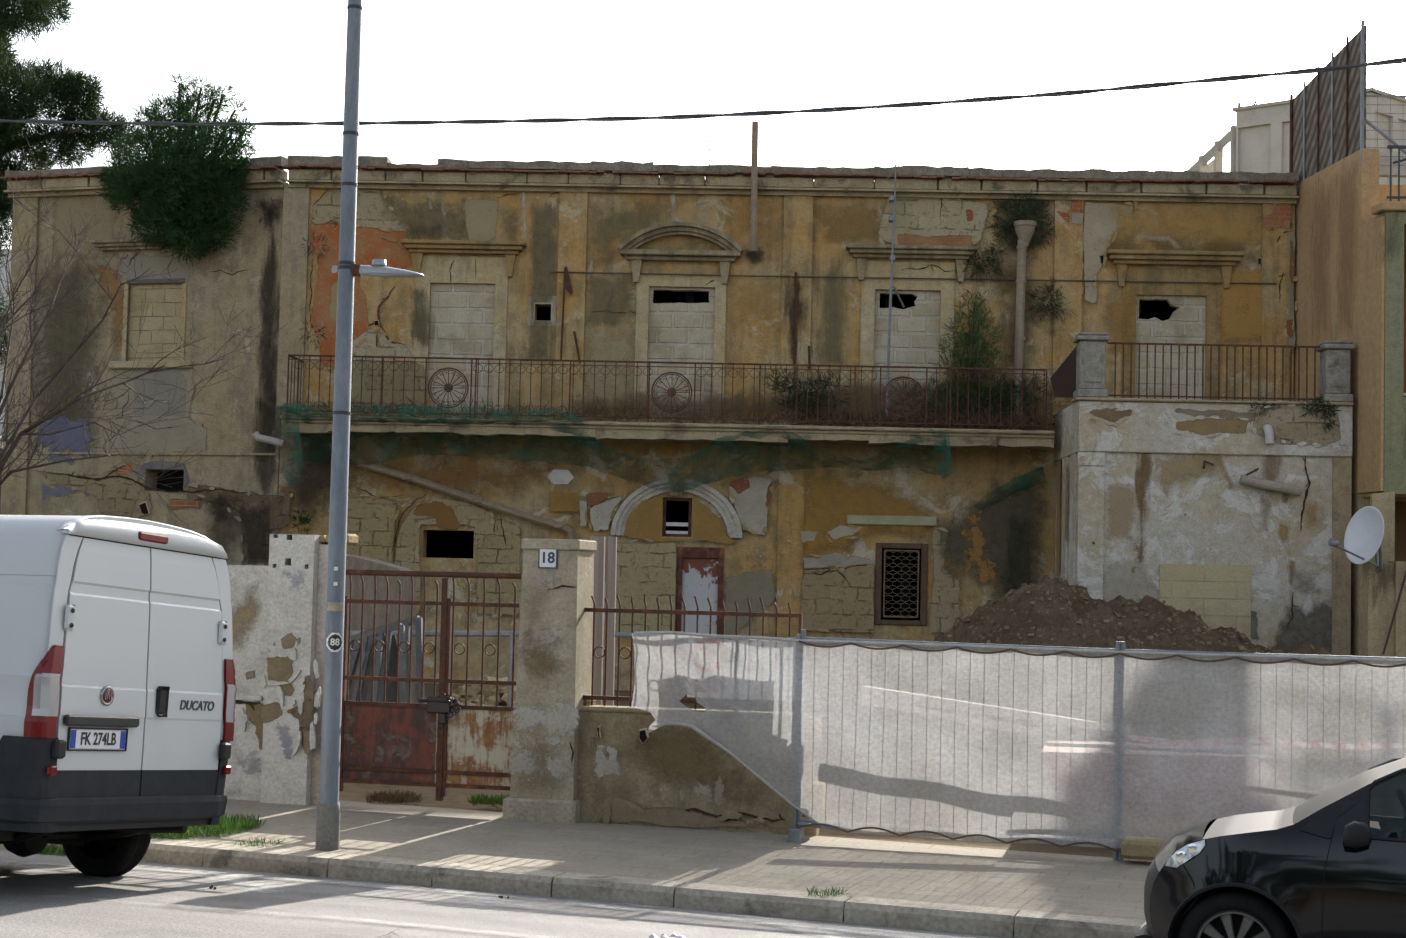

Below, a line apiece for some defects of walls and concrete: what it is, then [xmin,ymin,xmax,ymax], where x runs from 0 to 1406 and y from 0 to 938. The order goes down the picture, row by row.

flaking render [305,189,431,409]
crack [368,286,402,346]
damp [464,199,498,241]
damp [522,192,556,362]
flaking render [879,198,996,246]
flaking render [1057,200,1138,303]
damp [254,201,332,514]
flaking render [1175,400,1346,447]
damp [413,501,460,529]
crack [1300,456,1311,530]
damp [1275,575,1332,654]
flaking render [237,633,321,756]